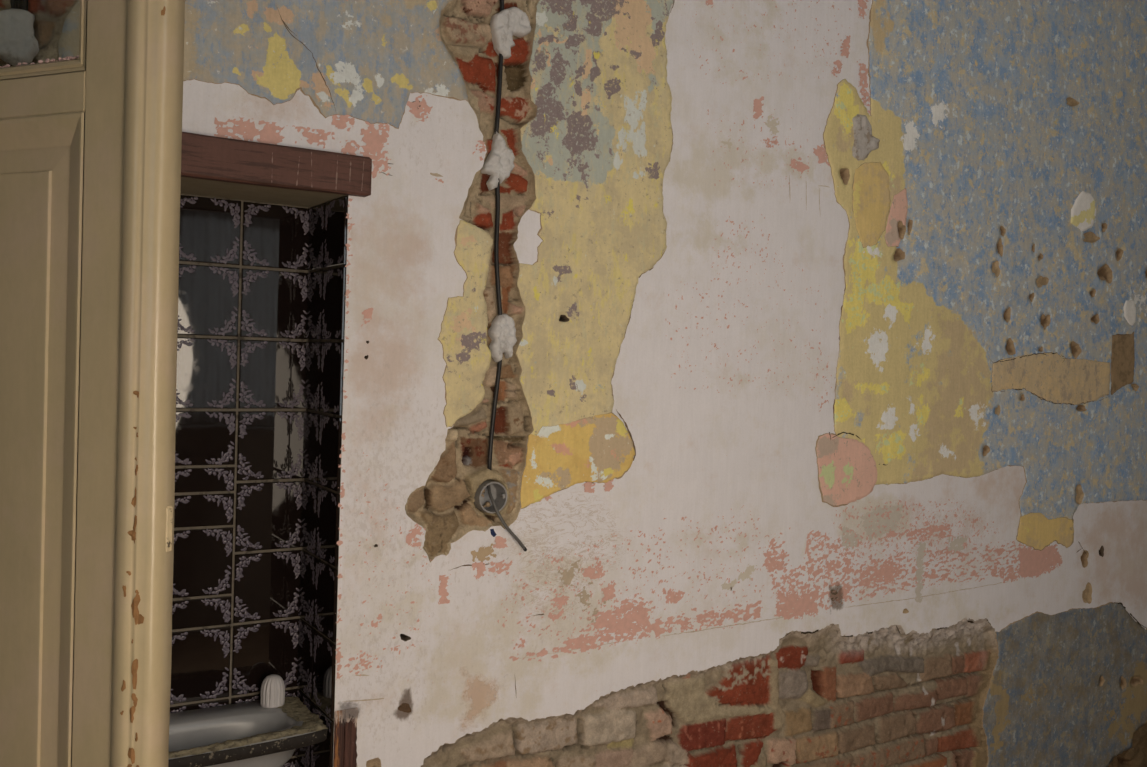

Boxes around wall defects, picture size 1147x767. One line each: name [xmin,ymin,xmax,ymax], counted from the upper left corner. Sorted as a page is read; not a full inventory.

crack [279,13,337,113]
peeling [183,0,1147,680]
peeling [127,457,138,544]
peeling [122,571,144,625]
peeling [120,659,139,767]
flaking render [421,582,1147,767]